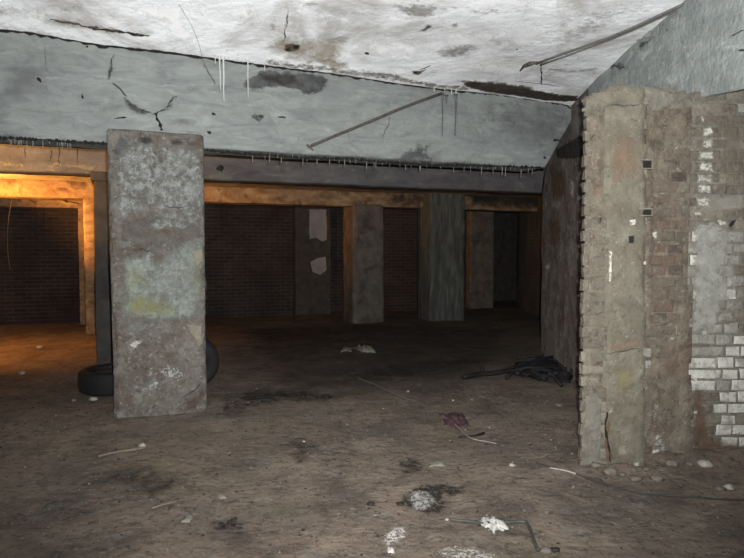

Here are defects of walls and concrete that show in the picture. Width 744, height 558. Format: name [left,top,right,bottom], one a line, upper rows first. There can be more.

water stain [273,40,345,67]
crack [108,55,177,131]
water stain [244,70,327,97]
peeling [695,140,713,215]
crack [604,412,612,462]